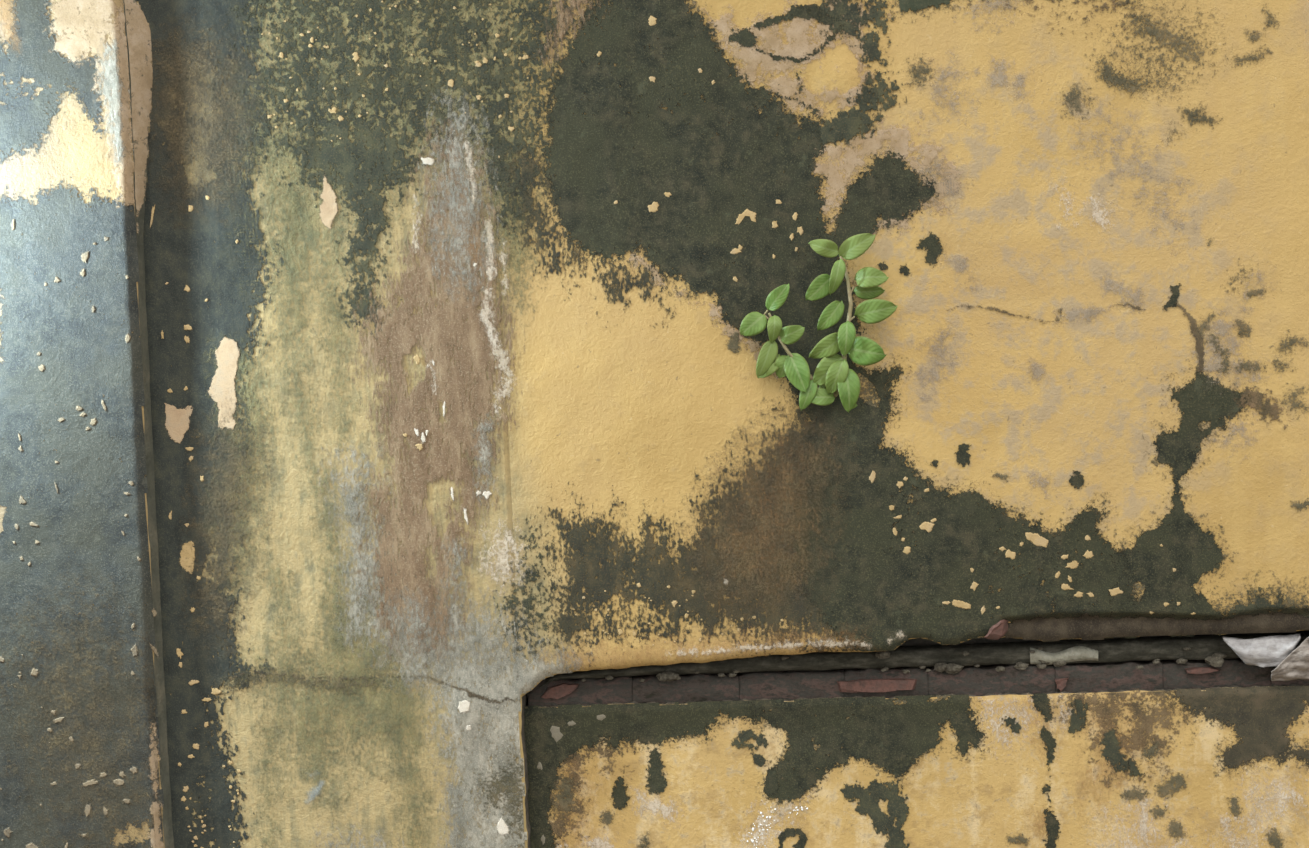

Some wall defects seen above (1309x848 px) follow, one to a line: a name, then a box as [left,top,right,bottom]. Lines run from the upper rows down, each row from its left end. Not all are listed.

water stain [816,0,972,67]
peeling [50,0,153,233]
water stain [877,262,910,276]
water stain [916,232,943,268]
crack [947,278,1215,372]
peeling [208,337,240,430]
peeling [164,403,193,444]
water stain [954,443,971,467]
peeling [179,541,195,574]
crack [220,667,521,703]